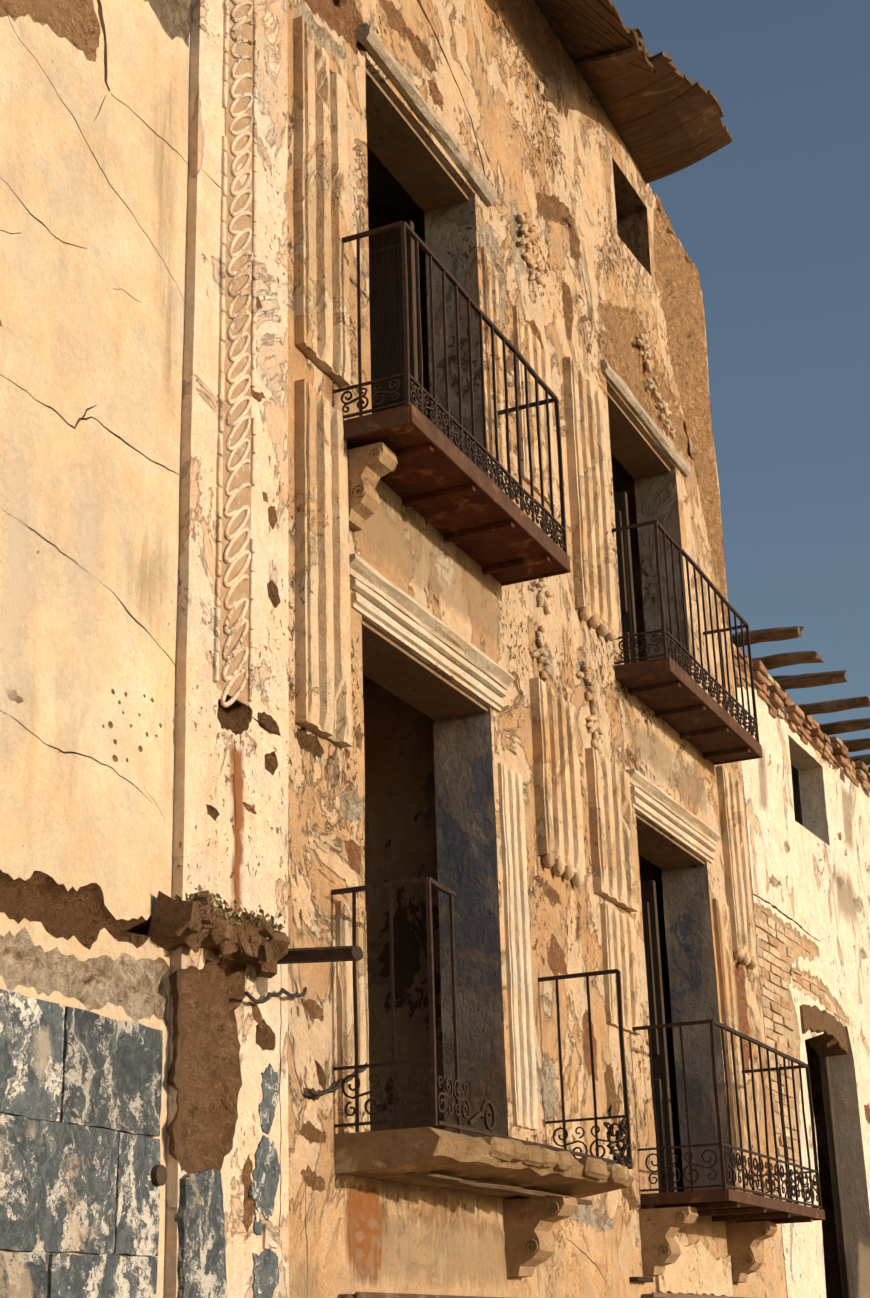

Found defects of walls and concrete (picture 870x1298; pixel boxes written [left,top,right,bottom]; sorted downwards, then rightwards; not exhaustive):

spalling [296,0,368,61]
spalling [379,0,443,111]
crack [0,0,221,303]
crack [0,374,180,476]
crack [2,509,176,668]
spalling [267,580,280,608]
spalling [217,696,324,775]
peeling [206,804,220,821]
rust [231,748,244,915]
spalling [167,957,275,1174]
flaking render [734,903,849,1171]
spalling [298,1121,326,1144]